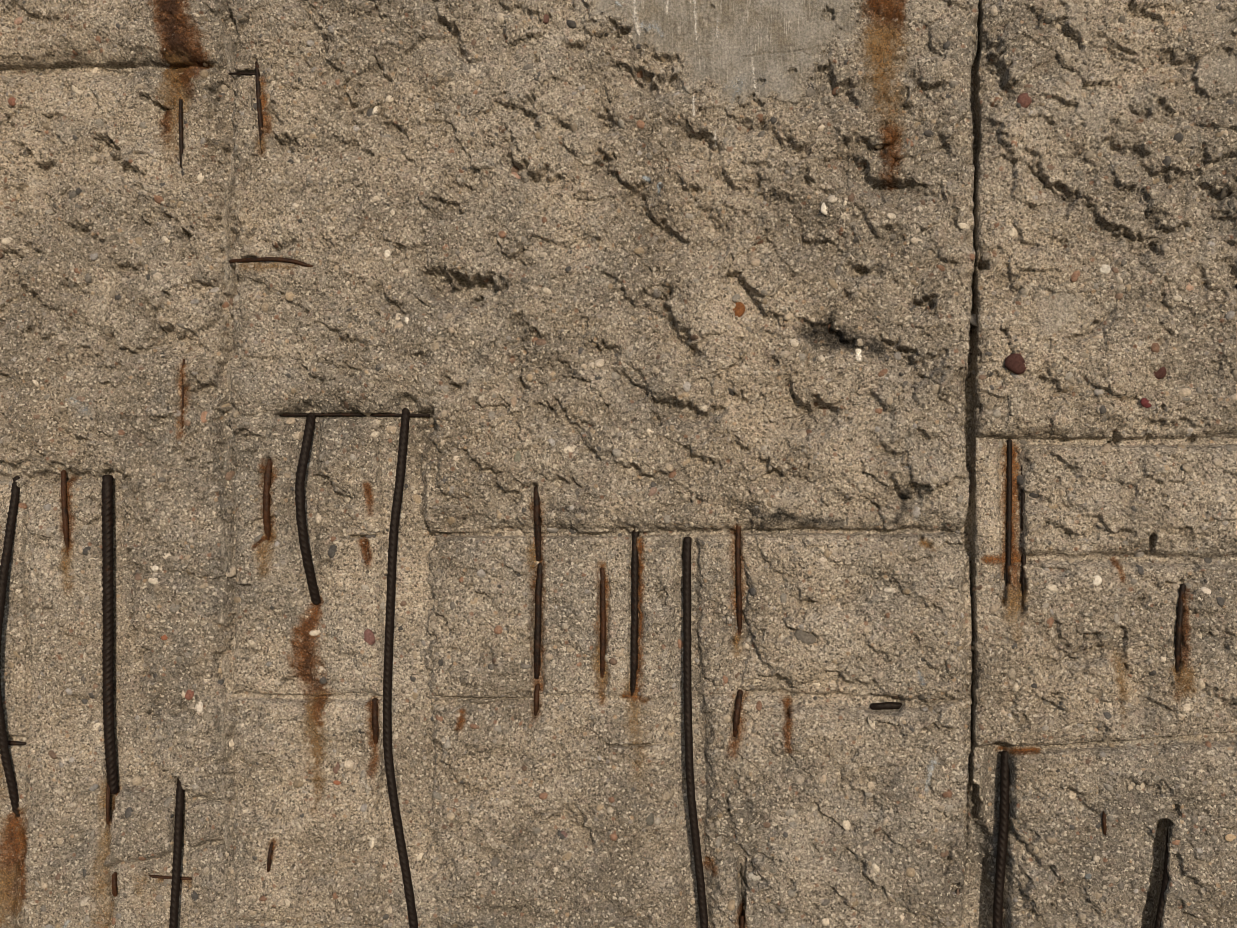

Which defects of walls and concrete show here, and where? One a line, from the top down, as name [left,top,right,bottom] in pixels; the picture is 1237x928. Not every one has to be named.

rust [148,0,210,161]
rust [861,0,906,190]
spalling [0,476,27,820]
spalling [101,475,119,825]
rust [288,597,331,811]
spalling [280,408,430,928]
spalling [533,486,543,716]
spalling [683,536,708,928]
rust [982,442,1025,631]
rust [1174,590,1195,700]
rust [0,809,27,925]
spalling [148,778,192,928]